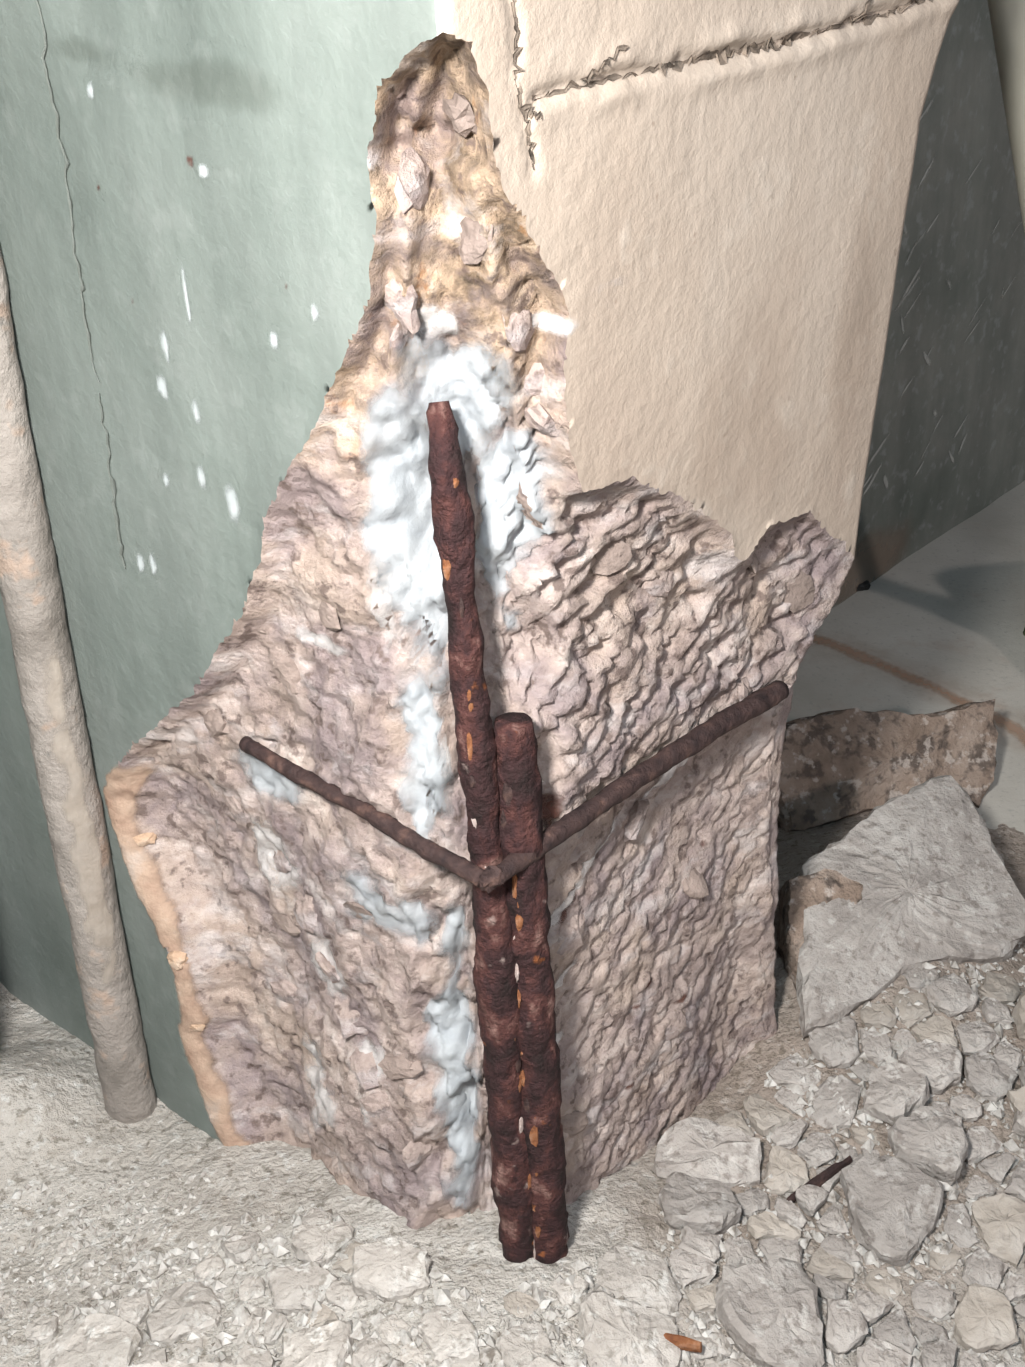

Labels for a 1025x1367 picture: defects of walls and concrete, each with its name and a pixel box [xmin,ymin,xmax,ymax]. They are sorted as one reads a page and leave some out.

crack [511,0,933,170]
corrosion [442,559,451,581]
spalling [103,32,854,1230]
corrosion [467,733,476,788]
corrosion [542,794,560,827]
corrosion [512,875,523,940]
corrosion [518,1052,538,1147]
corrosion [528,1173,541,1258]